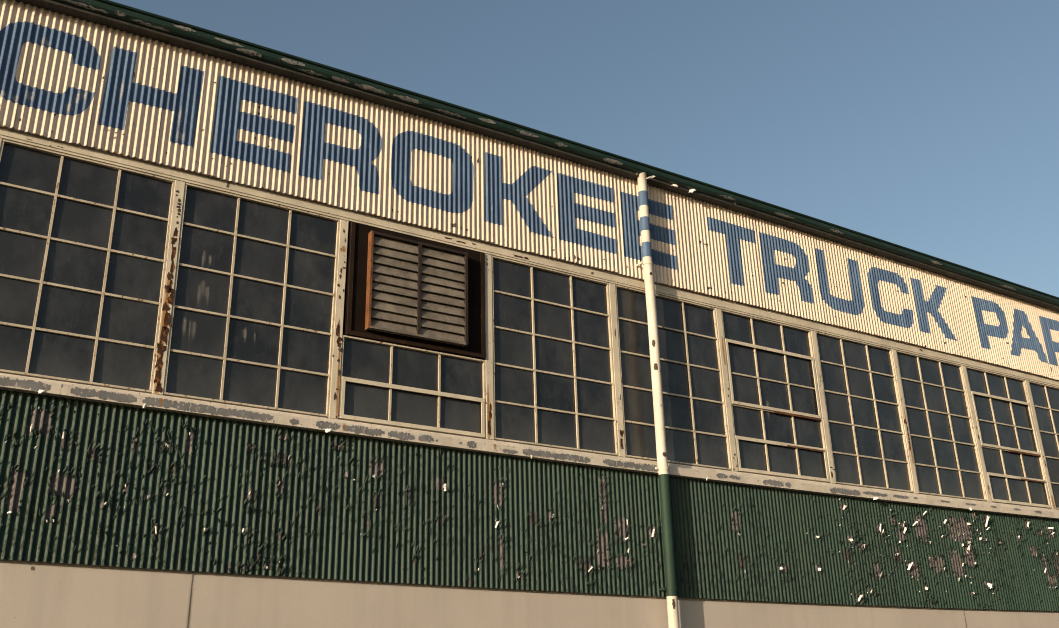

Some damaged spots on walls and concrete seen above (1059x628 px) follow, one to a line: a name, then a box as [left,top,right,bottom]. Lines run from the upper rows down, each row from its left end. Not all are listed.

rust [154,227,178,404]
peeling [0,377,50,394]
peeling [28,407,77,448]
peeling [70,387,273,422]
peeling [316,416,438,451]
peeling [6,467,25,515]
peeling [492,467,504,579]
peeling [577,452,667,575]
peeling [851,555,890,603]
peeling [830,466,918,525]
peeling [876,500,1002,602]
peeling [1014,508,1059,589]